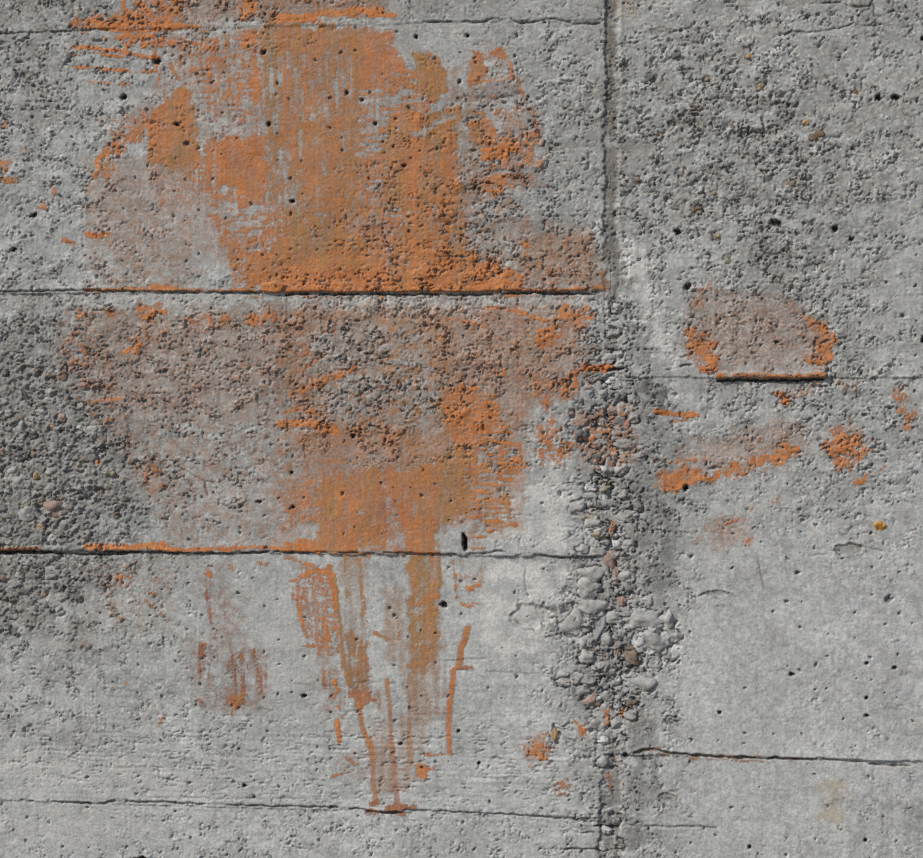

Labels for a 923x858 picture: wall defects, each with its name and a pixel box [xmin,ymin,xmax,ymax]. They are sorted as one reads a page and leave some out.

rust [204,570,212,623]
rust [193,642,209,679]
rust [225,649,267,714]